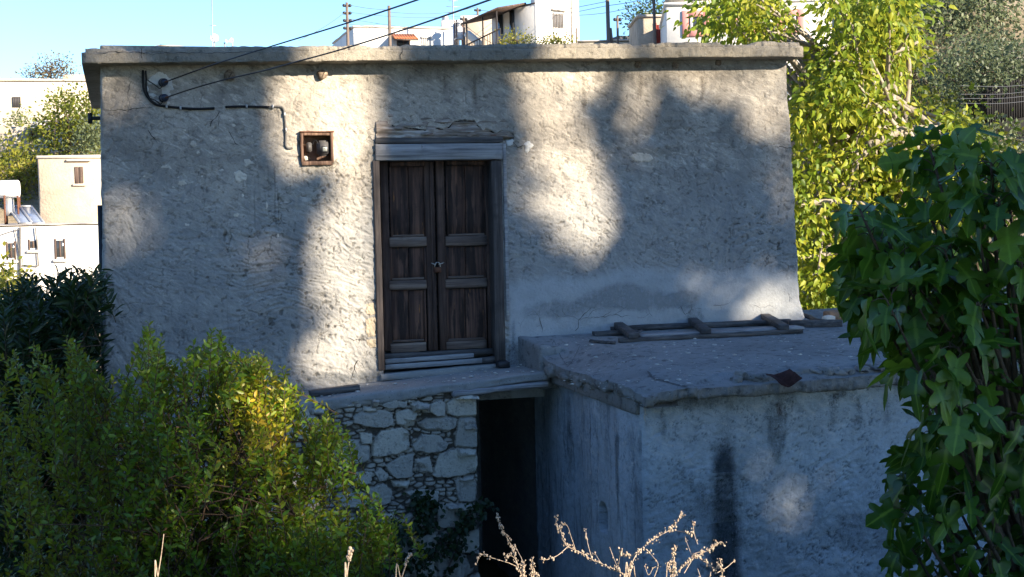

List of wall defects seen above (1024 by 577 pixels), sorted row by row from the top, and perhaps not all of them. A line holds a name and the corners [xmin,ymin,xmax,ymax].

spalling [389,117,534,153]
corrosion [766,369,802,387]
leakage [712,449,739,577]